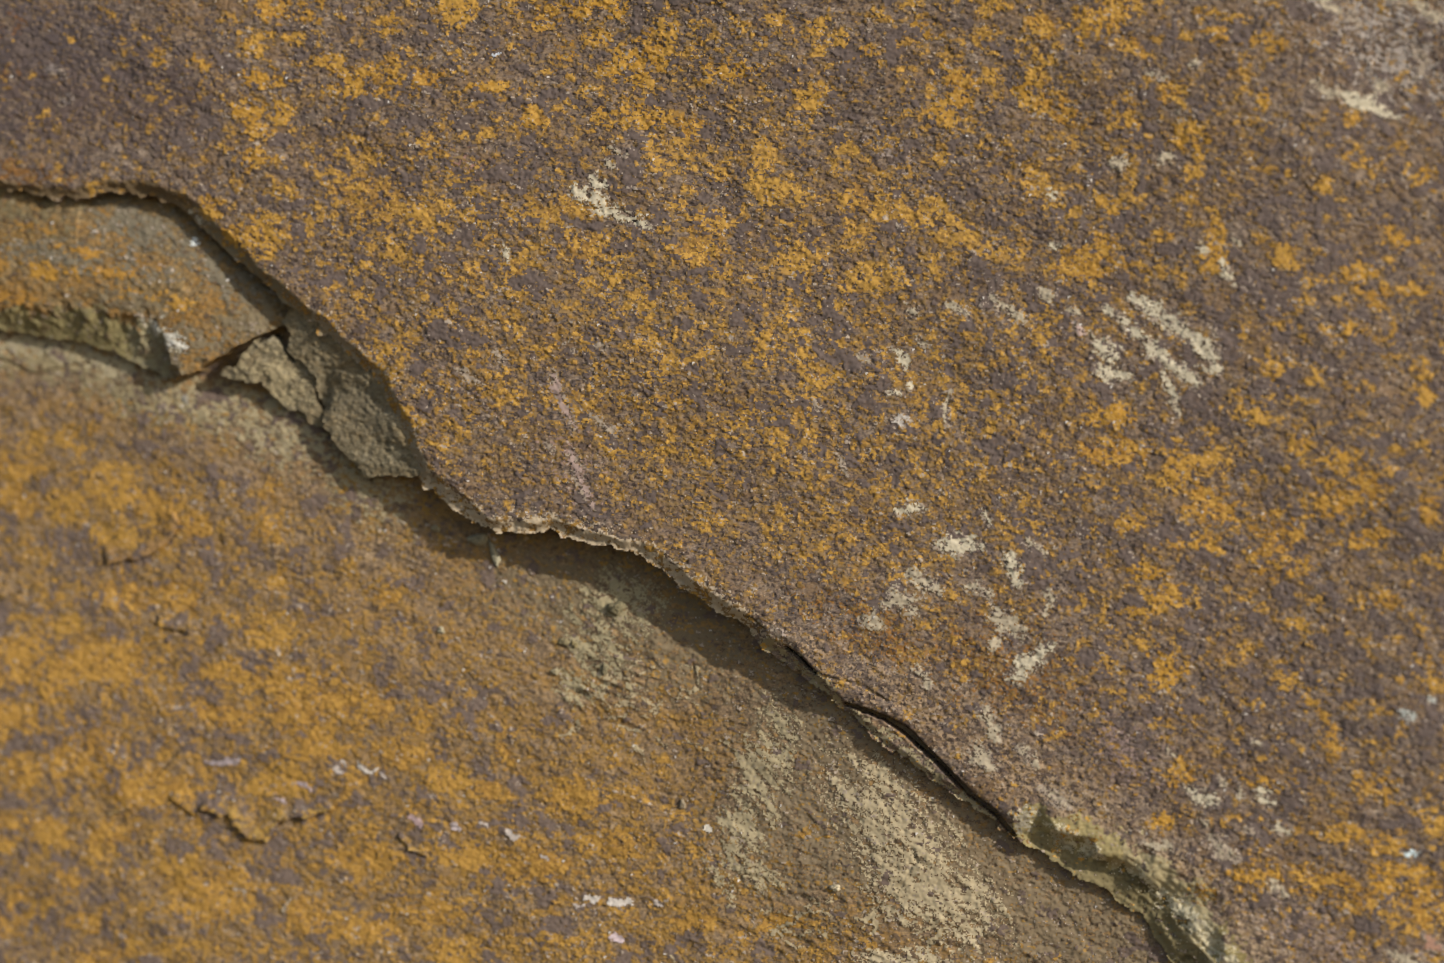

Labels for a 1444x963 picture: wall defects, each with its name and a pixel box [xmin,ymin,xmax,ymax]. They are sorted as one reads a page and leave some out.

spalling [0,178,1253,963]
crack [743,614,1005,820]